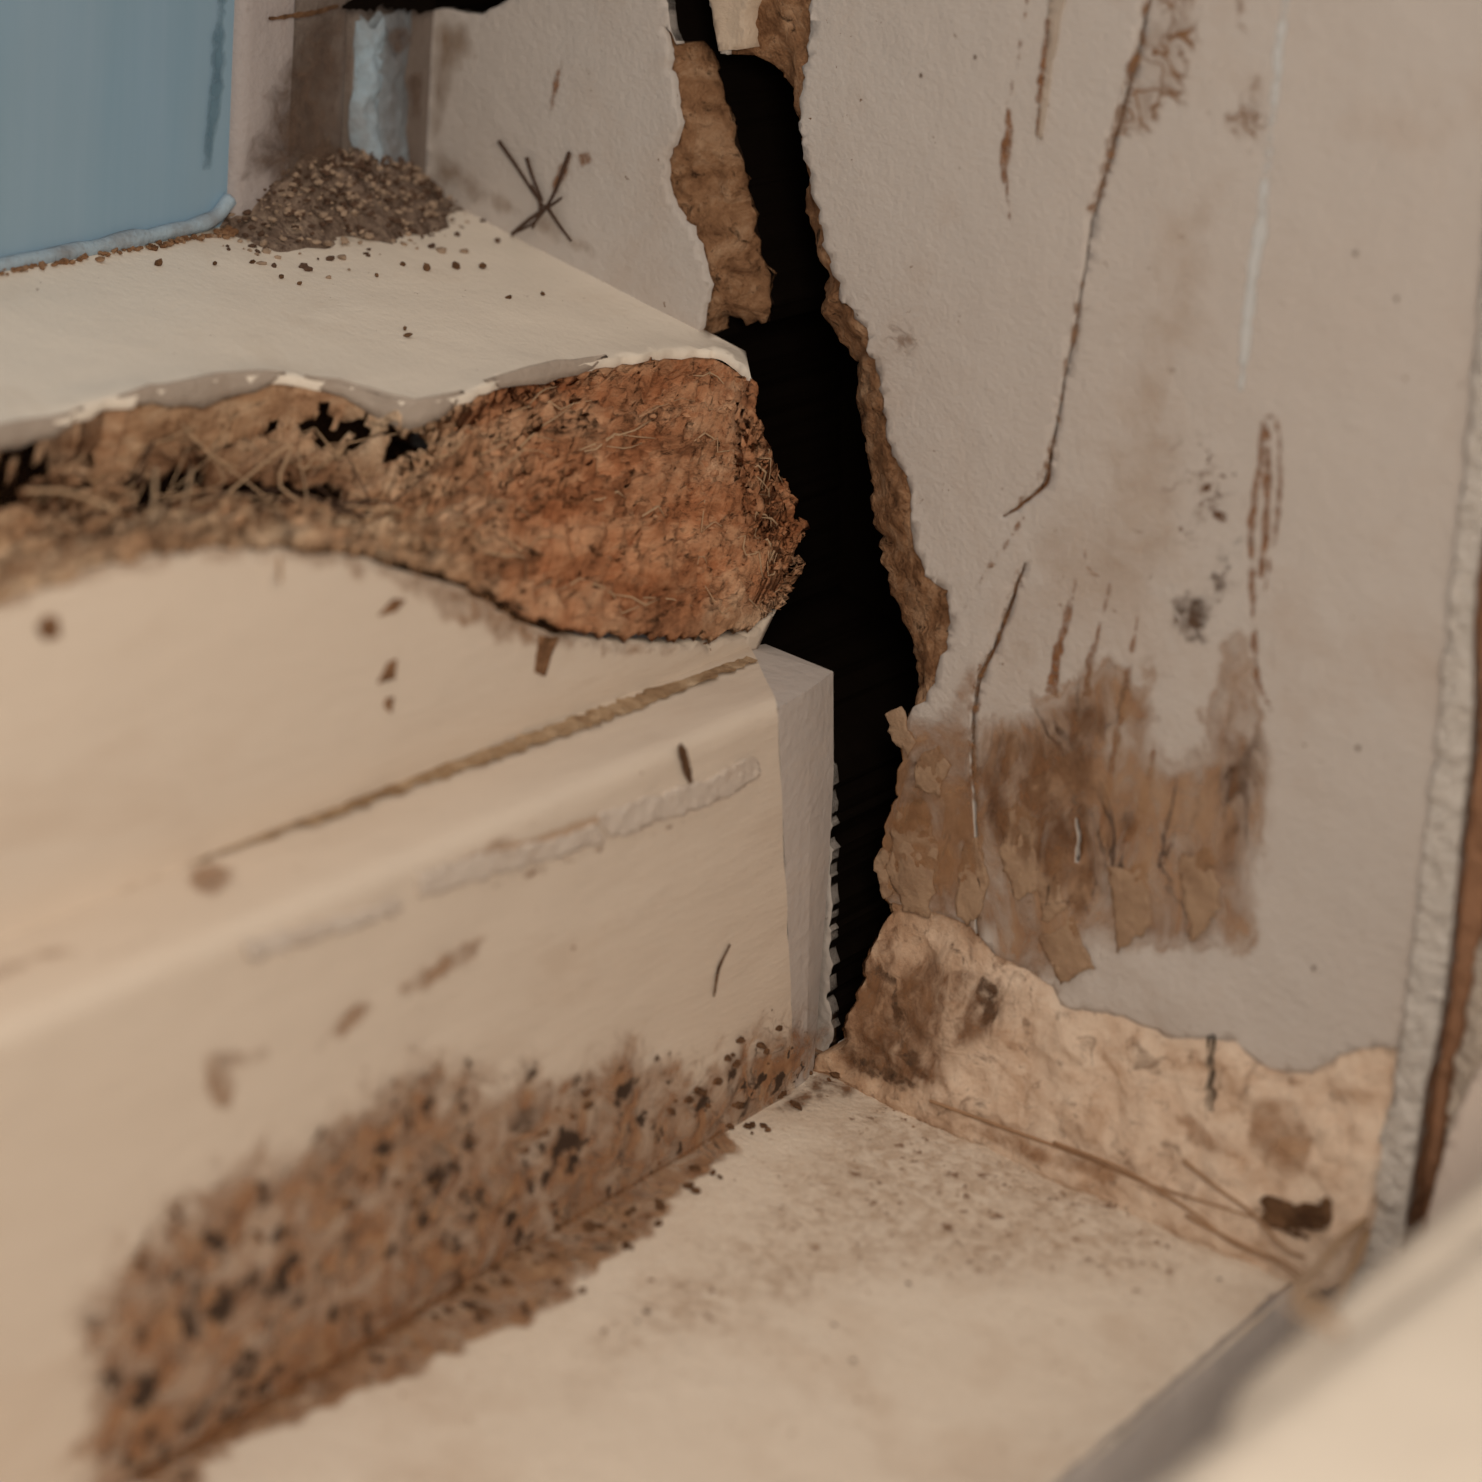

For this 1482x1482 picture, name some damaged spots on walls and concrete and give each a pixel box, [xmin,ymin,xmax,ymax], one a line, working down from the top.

crack [268,0,507,21]
peeling [483,355,608,388]
spalling [668,0,811,334]
crack [1005,0,1150,516]
rust [1087,0,1193,210]
crack [667,0,919,1048]
crack [971,562,1026,837]
spalling [805,164,1398,1294]
rust [1247,415,1282,704]
peeling [1442,940,1482,1161]
leakage [75,1010,823,1482]
leakage [768,1107,1178,1292]